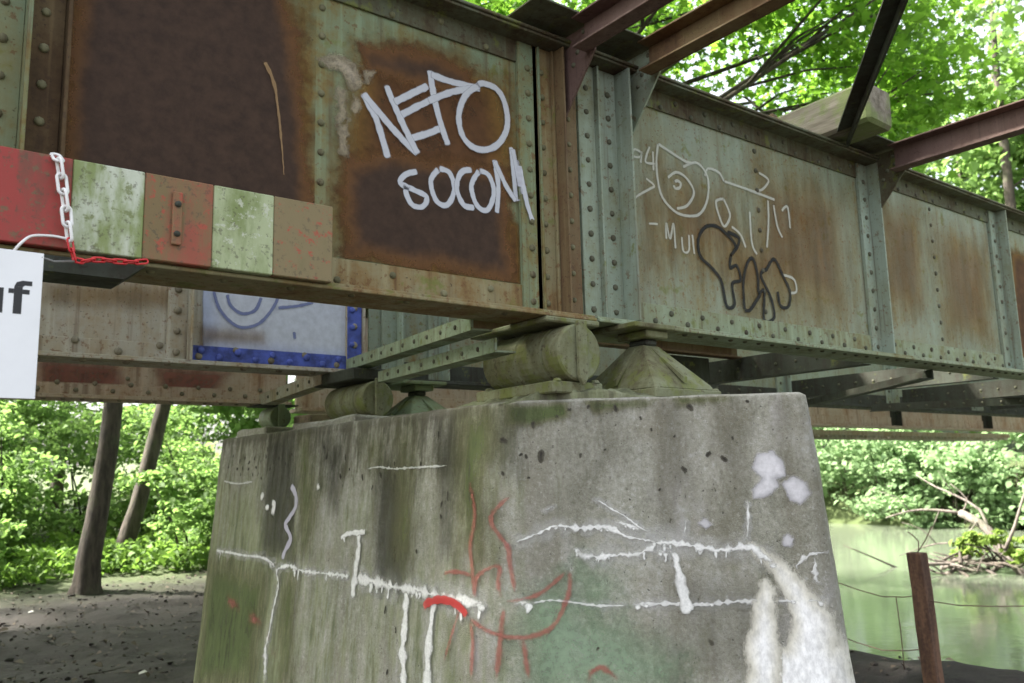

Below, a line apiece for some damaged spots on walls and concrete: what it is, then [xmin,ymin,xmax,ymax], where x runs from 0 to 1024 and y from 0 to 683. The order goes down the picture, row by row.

corrosion [65,0,315,204]
corrosion [334,41,520,284]
corrosion [1011,251,1024,357]
leakage [341,431,418,599]
leakage [752,451,810,503]
leakage [398,591,421,683]
leakage [423,604,437,683]
leakage [744,535,855,683]